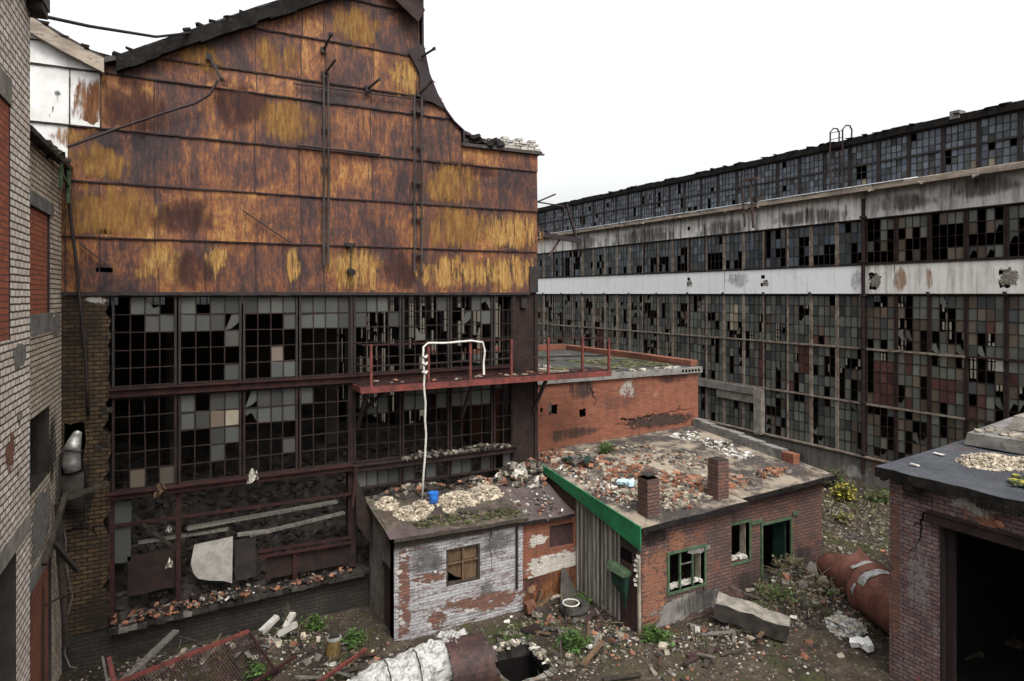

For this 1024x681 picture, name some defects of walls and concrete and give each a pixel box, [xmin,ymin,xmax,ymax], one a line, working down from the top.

corrosion [52,79,114,145]
damp [958,177,1017,197]
corrosion [158,200,211,232]
damp [782,205,846,226]
damp [883,195,923,215]
corrosion [175,252,211,286]
spalling [869,274,882,290]
spalling [998,267,1019,287]
crack [620,406,688,423]
crack [909,512,926,560]
peeling [396,548,446,639]
peeling [427,534,576,631]